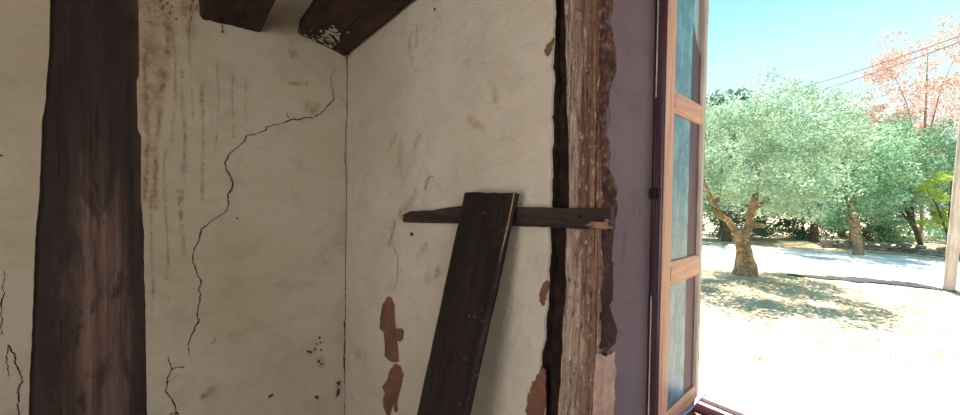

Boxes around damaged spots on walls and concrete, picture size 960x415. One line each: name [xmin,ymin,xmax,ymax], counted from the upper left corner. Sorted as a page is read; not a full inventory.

peeling [543,37,555,56]
crack [0,271,23,415]
crack [165,56,348,415]
peeling [379,296,404,415]
peeling [525,367,547,415]
peeling [539,280,550,306]